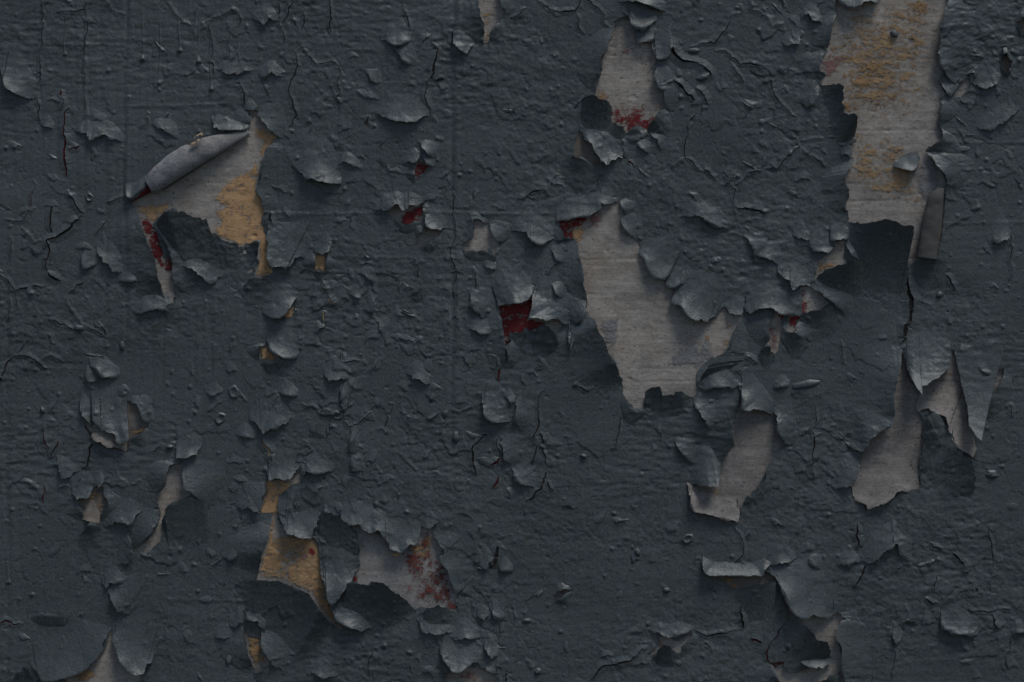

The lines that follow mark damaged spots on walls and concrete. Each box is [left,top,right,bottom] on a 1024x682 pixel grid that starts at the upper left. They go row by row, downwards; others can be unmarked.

peeling [72,19,382,452]
peeling [422,0,1024,529]
crack [896,262,922,346]
peeling [12,423,572,682]
peeling [695,541,876,682]